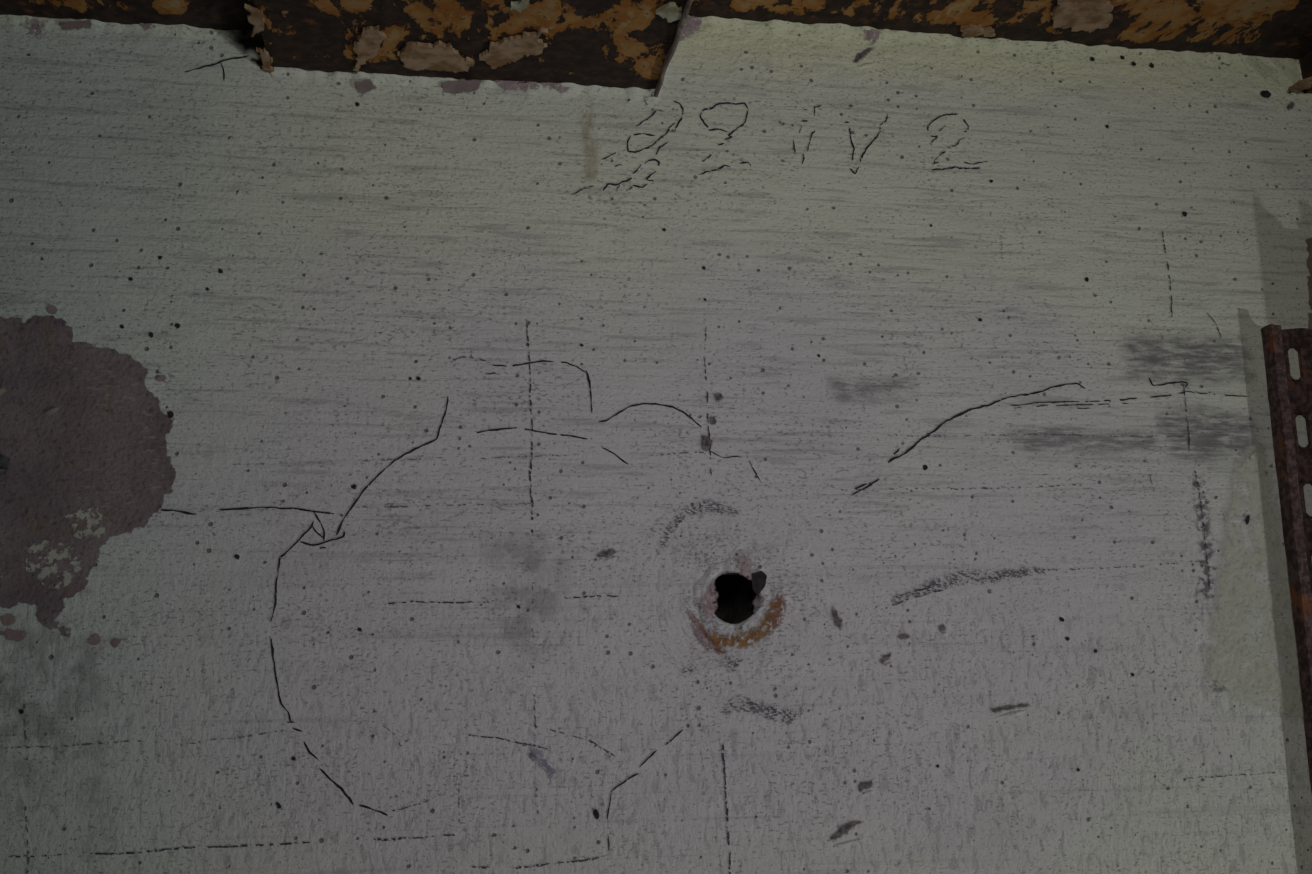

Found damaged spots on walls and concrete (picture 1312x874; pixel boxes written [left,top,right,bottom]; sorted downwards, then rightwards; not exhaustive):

corrosion [690,591,786,654]